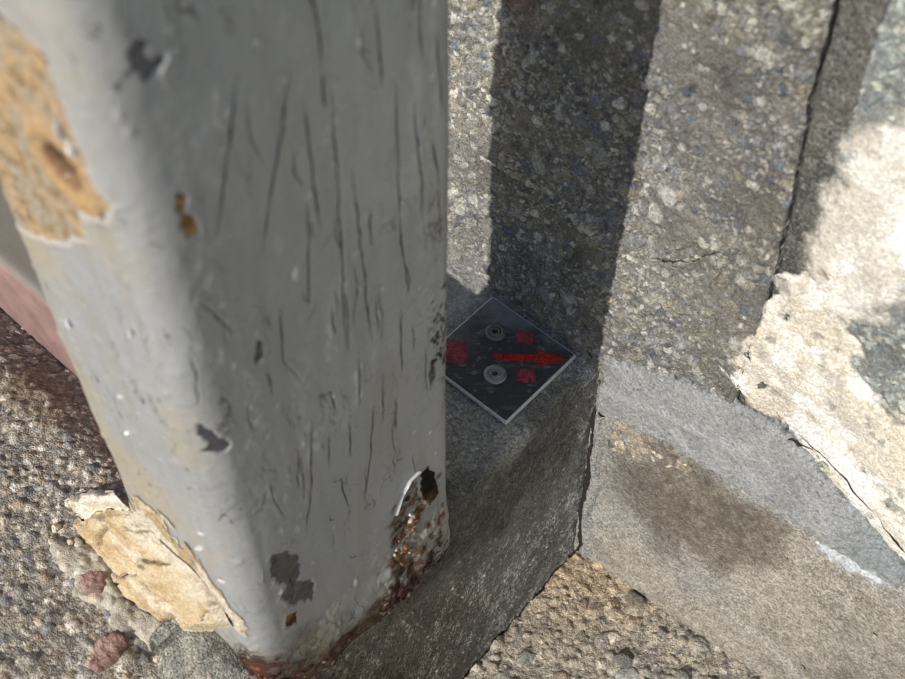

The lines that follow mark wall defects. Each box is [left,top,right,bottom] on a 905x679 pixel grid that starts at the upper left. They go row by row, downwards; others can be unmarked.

peeling [126,38,165,81]
corrosion [174,193,199,239]
crack [764,0,838,314]
leakage [803,109,905,325]
spalling [49,535,163,673]
peeling [196,424,230,452]
peeling [269,551,314,605]
corrosion [236,480,448,679]
crack [462,350,606,679]
peeling [719,257,905,560]
crack [762,397,905,553]